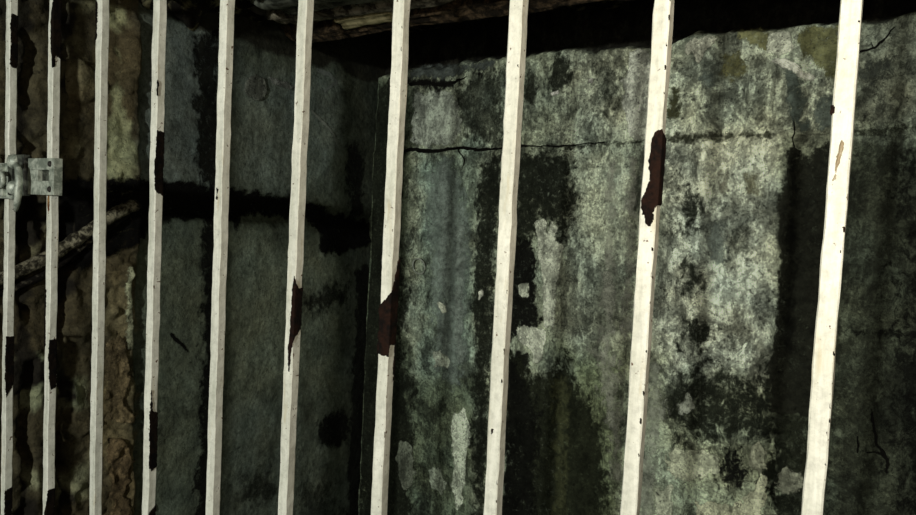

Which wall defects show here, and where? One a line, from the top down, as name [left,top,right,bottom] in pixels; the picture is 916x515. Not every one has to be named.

crack [859,27,895,53]
water stain [523,50,573,104]
water stain [667,86,682,119]
water stain [783,64,833,133]
crack [666,119,795,147]
crack [855,125,916,136]
crack [403,140,641,170]
water stain [502,143,613,515]
water stain [640,142,830,515]